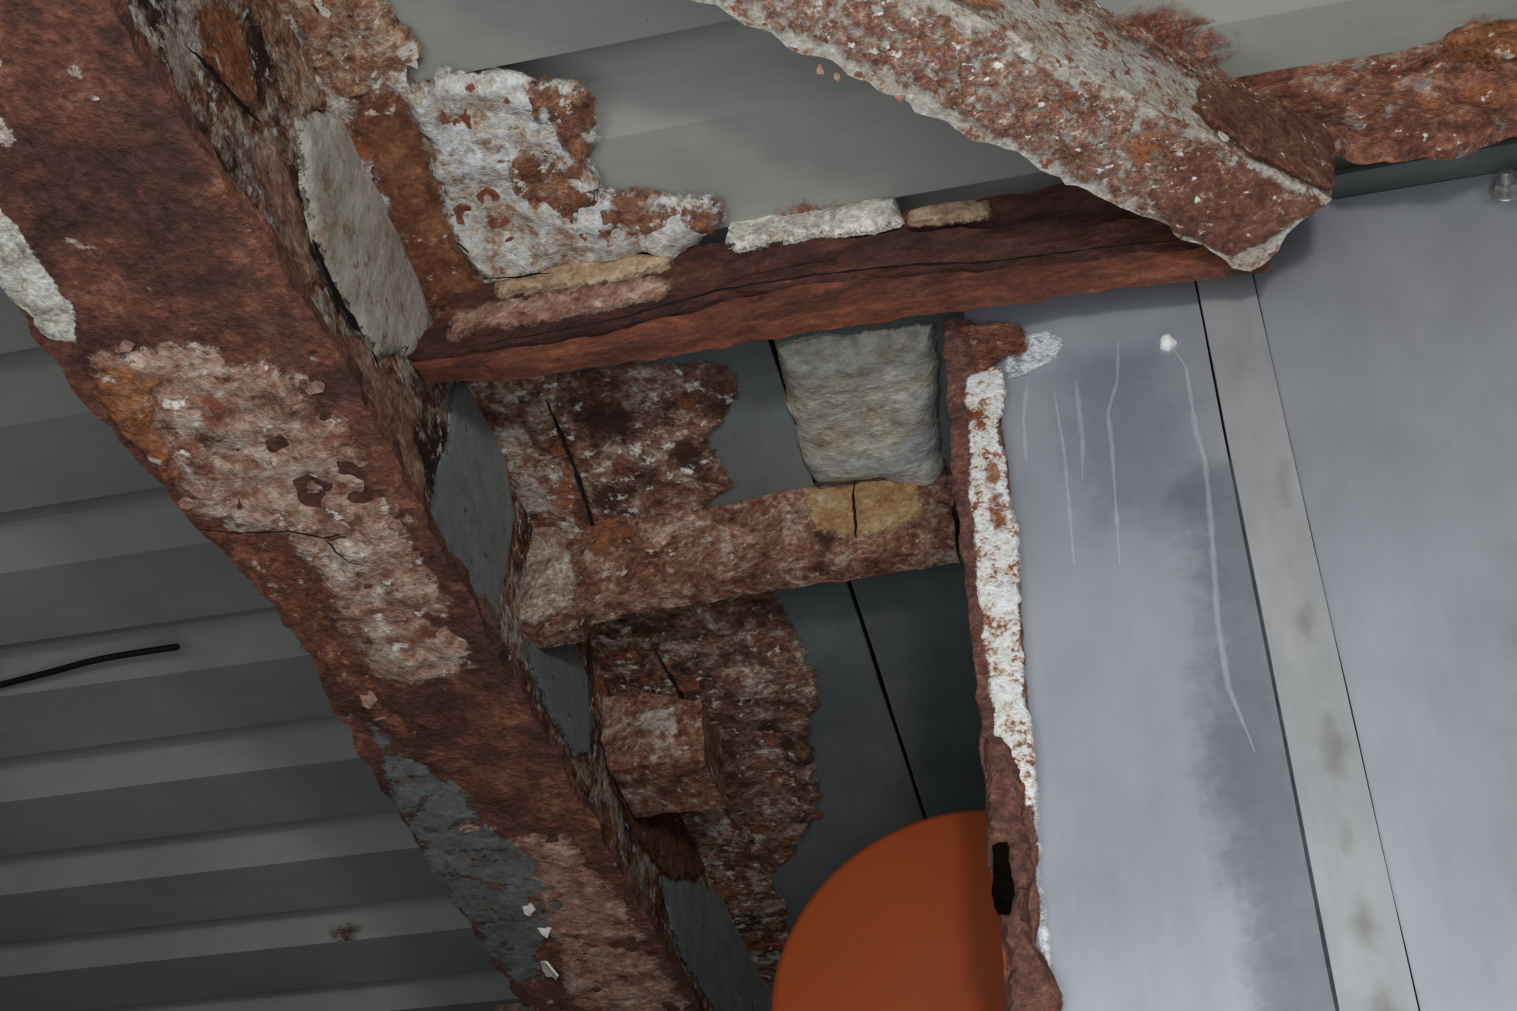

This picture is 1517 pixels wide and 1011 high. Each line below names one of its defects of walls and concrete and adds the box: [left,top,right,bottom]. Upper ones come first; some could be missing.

rust [197,3,257,110]
rust [288,0,480,309]
spalling [402,65,727,282]
rust [508,75,726,241]
rust [744,0,1336,256]
rust [956,321,1030,372]
efflorescence [1005,332,1063,378]
damp [1159,334,1177,351]
rust [88,339,477,685]
peeling [964,367,1062,1011]
damp [1033,787,1054,976]